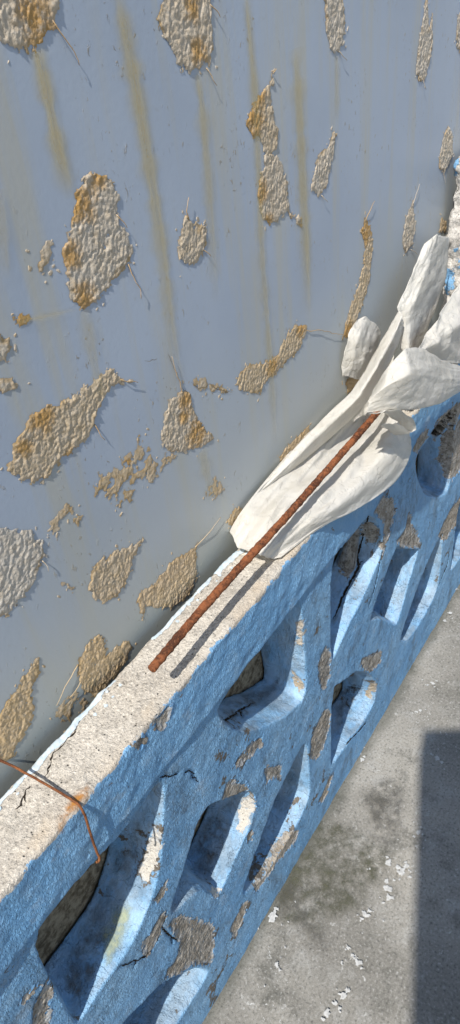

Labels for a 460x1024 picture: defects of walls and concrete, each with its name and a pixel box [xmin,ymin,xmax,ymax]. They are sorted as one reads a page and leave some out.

peeling [0,0,79,63]
peeling [156,0,220,86]
peeling [246,68,303,231]
peeling [25,170,142,311]
peeling [93,197,375,517]
peeling [0,368,138,485]
peeling [0,503,84,618]
spalling [136,411,381,673]
crack [333,516,381,618]
crack [16,720,81,809]
spalling [138,826,165,882]
spalling [141,880,215,980]